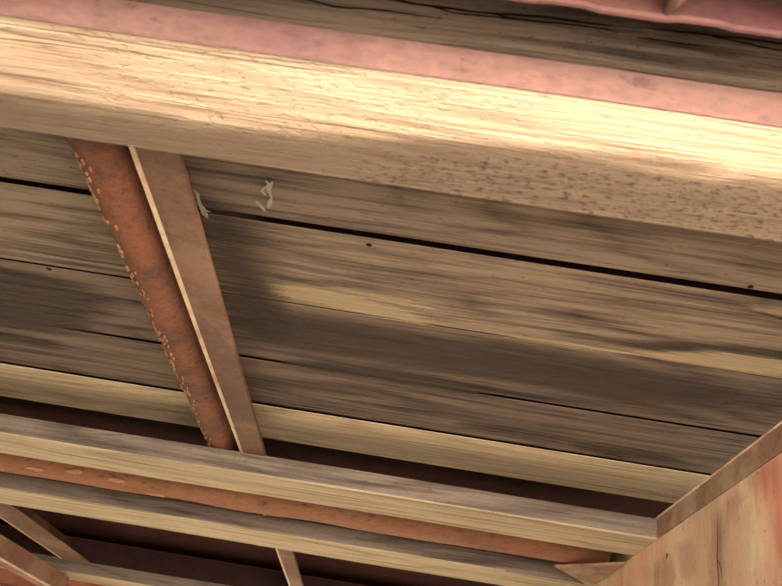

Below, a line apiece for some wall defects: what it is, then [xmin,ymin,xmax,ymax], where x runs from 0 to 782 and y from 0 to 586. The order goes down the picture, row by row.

crack [308,0,782,51]